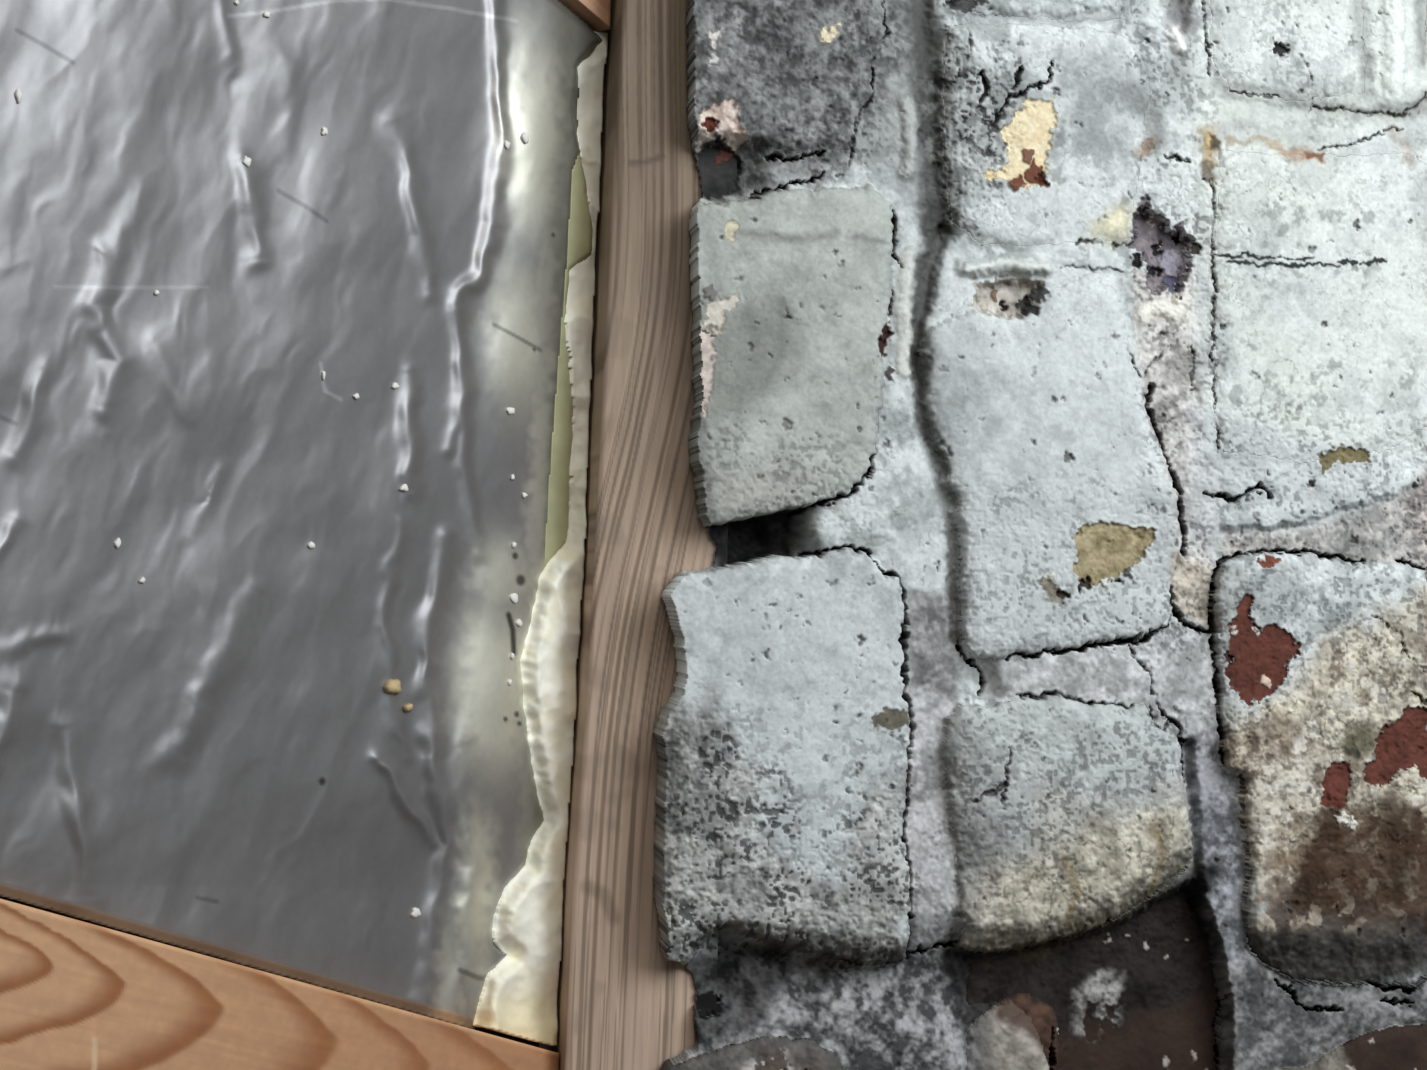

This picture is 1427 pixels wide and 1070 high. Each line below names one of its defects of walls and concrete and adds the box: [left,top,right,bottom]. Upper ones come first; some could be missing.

crack [969,34,1053,127]
peeling [984,97,1057,191]
spalling [1126,194,1202,295]
spalling [972,277,1051,319]
crack [1131,155,1219,448]
crack [788,459,872,516]
crack [1169,473,1270,503]
peeling [1307,444,1371,487]
crack [798,545,892,576]
peeling [1037,521,1156,609]
crack [955,612,1224,782]
leakage [1291,798,1427,924]